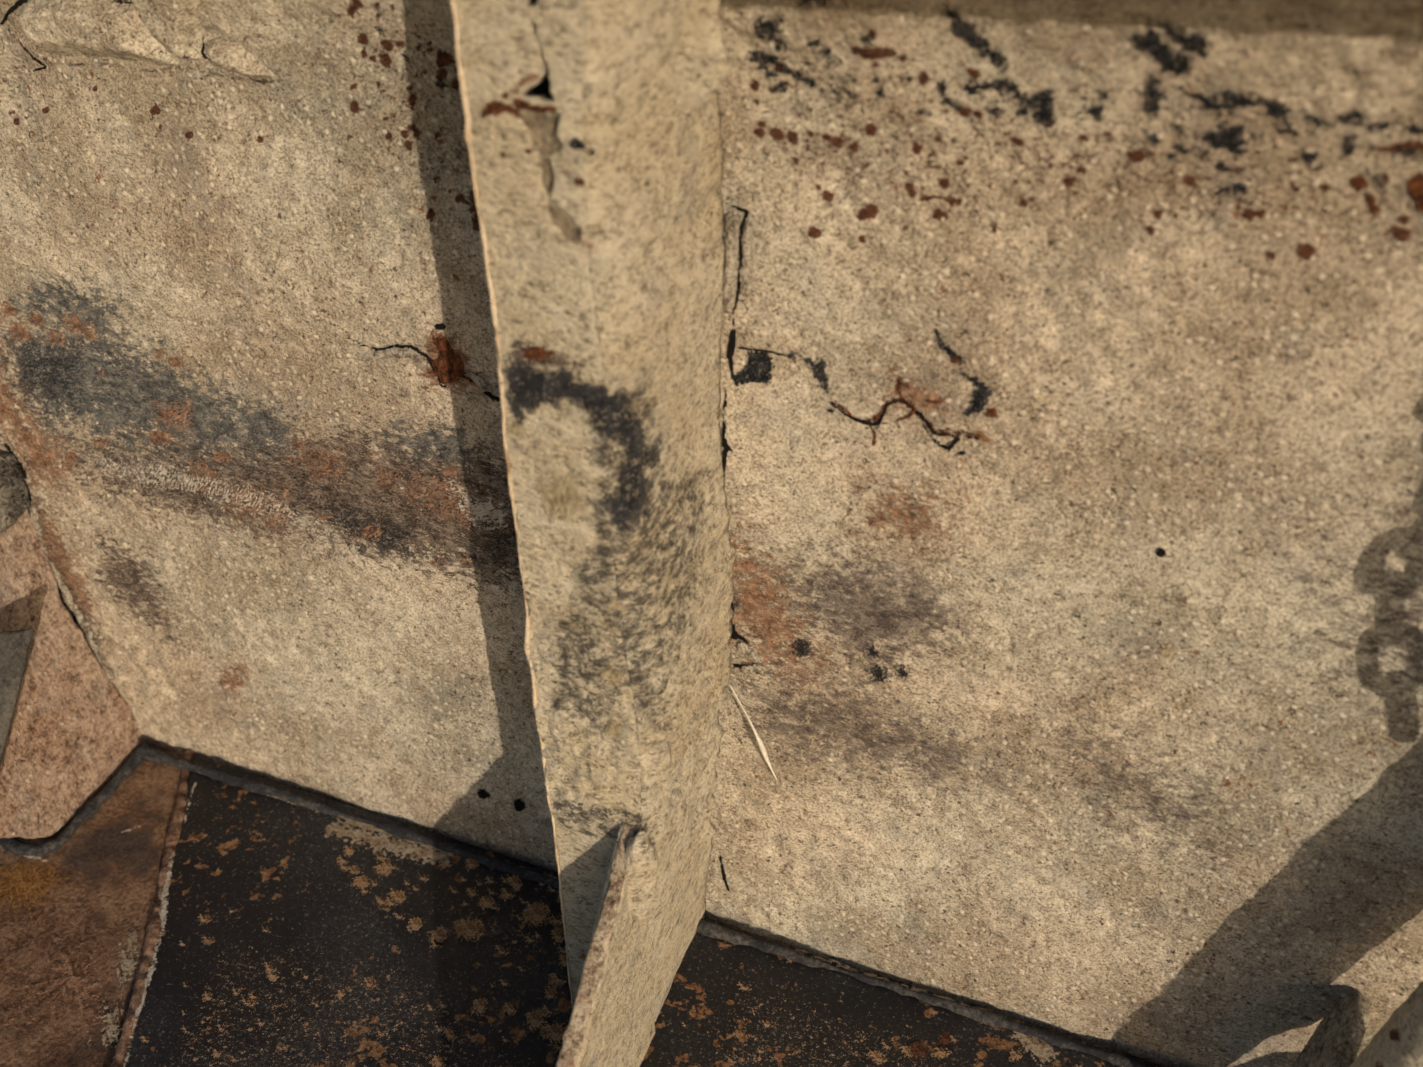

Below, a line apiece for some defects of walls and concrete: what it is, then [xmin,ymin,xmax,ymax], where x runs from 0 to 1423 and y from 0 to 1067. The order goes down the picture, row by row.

corrosion [331,0,482,232]
spalling [518,109,579,244]
corrosion [750,29,1423,261]
leakage [0,266,325,491]
corrosion [0,292,528,656]
crack [348,322,501,409]
crack [722,201,994,488]
corrosion [215,655,249,697]
crack [731,585,774,678]
crack [719,856,730,892]